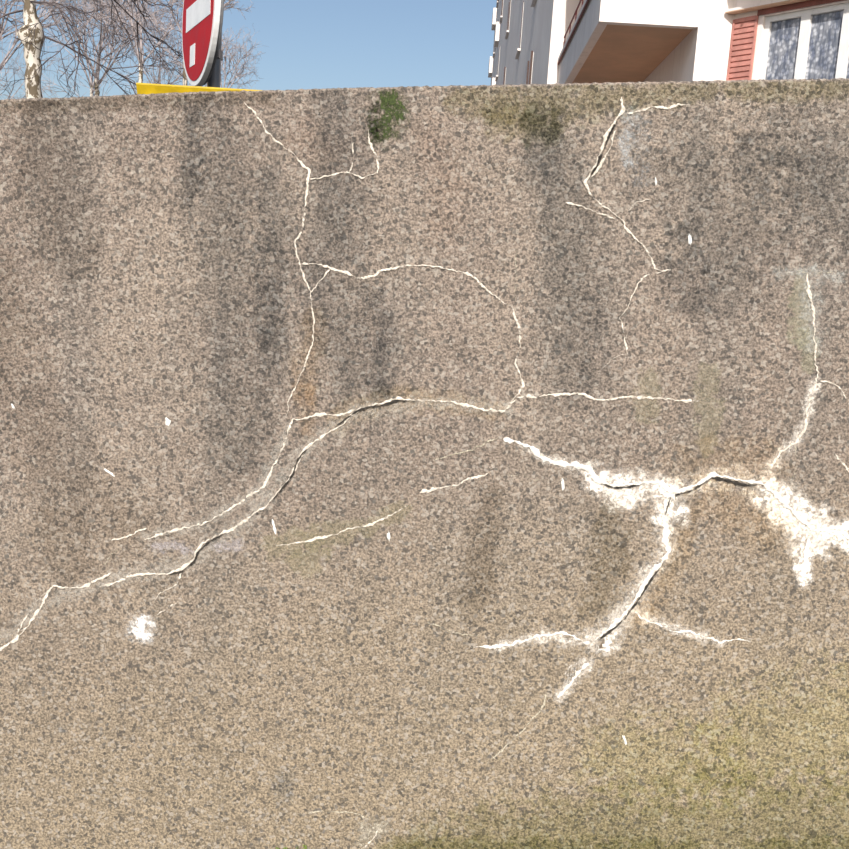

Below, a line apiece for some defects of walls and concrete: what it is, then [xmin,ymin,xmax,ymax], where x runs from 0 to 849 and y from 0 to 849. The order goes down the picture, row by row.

crack [0,97,694,651]
crack [429,272,849,764]
damp [499,425,849,652]
damp [556,658,592,702]
crack [304,811,379,848]